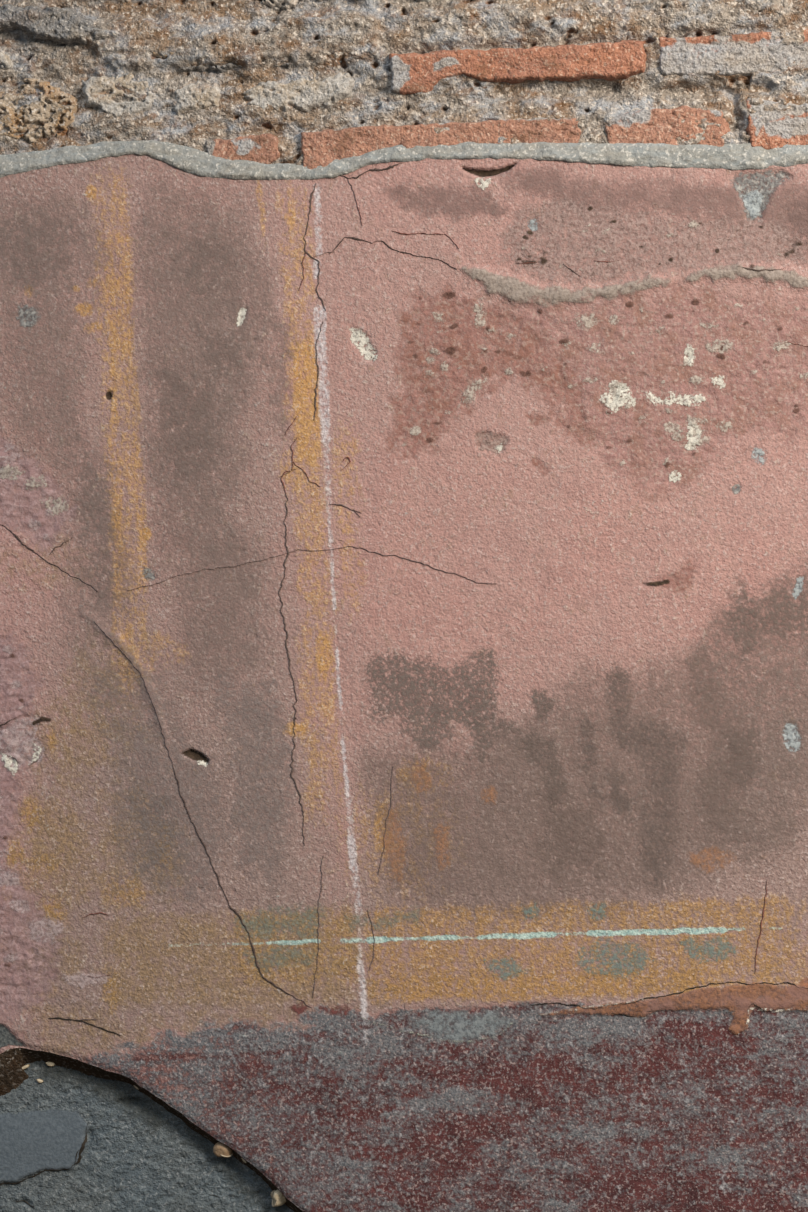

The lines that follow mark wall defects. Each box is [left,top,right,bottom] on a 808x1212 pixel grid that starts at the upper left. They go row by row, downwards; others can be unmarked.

crack [0,524,96,590]
crack [94,163,497,1008]
leakage [380,678,732,915]
spalling [0,635,304,1212]
peeling [550,982,808,1034]